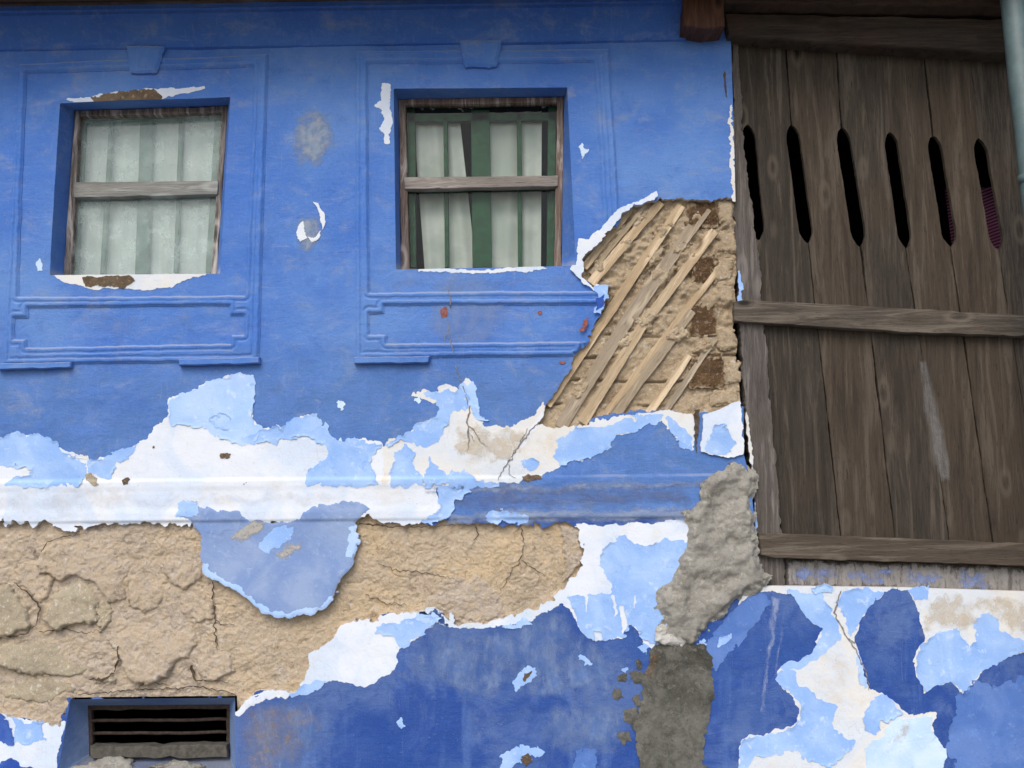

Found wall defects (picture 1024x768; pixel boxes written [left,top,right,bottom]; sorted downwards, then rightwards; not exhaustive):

flaking render [0,71,754,768]
crack [444,291,539,480]
crack [0,583,98,638]
crack [78,646,236,696]
crack [211,582,234,650]
crack [833,591,870,690]
peeling [697,567,1024,768]